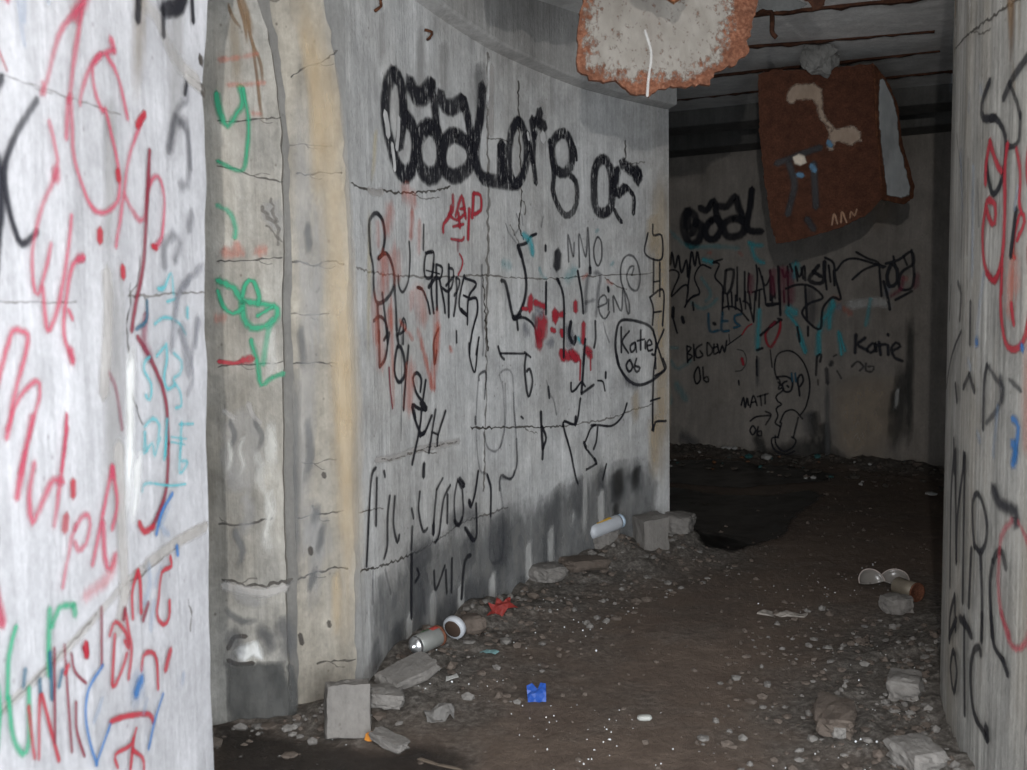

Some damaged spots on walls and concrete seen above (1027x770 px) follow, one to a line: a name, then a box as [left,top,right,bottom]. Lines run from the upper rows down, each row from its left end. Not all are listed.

corrosion [753,0,923,18]
corrosion [748,30,935,49]
corrosion [839,50,940,65]
corrosion [713,65,802,78]
corrosion [885,70,953,79]
crack [0,298,76,306]
crack [126,261,204,365]
crack [217,50,651,596]
water stain [375,467,653,654]
crack [2,517,273,714]
crack [316,658,356,666]